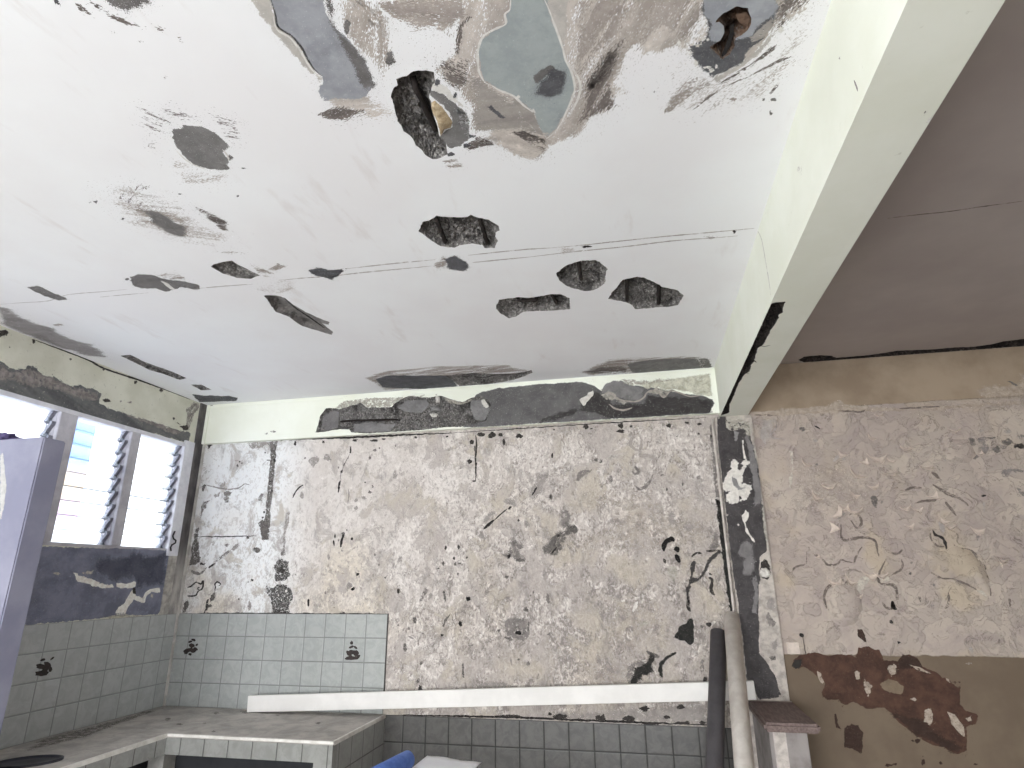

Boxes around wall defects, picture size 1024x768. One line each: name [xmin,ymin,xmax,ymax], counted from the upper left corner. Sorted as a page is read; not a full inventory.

peeling [251,0,378,126]
peeling [391,0,582,159]
peeling [677,0,784,82]
spalling [419,215,499,248]
peeling [125,272,200,292]
spalling [211,251,333,335]
spalling [496,260,683,318]
spalling [122,355,211,390]
spalling [316,394,491,434]
peeling [566,474,714,582]
peeling [717,302,1024,701]
peeling [575,590,672,685]